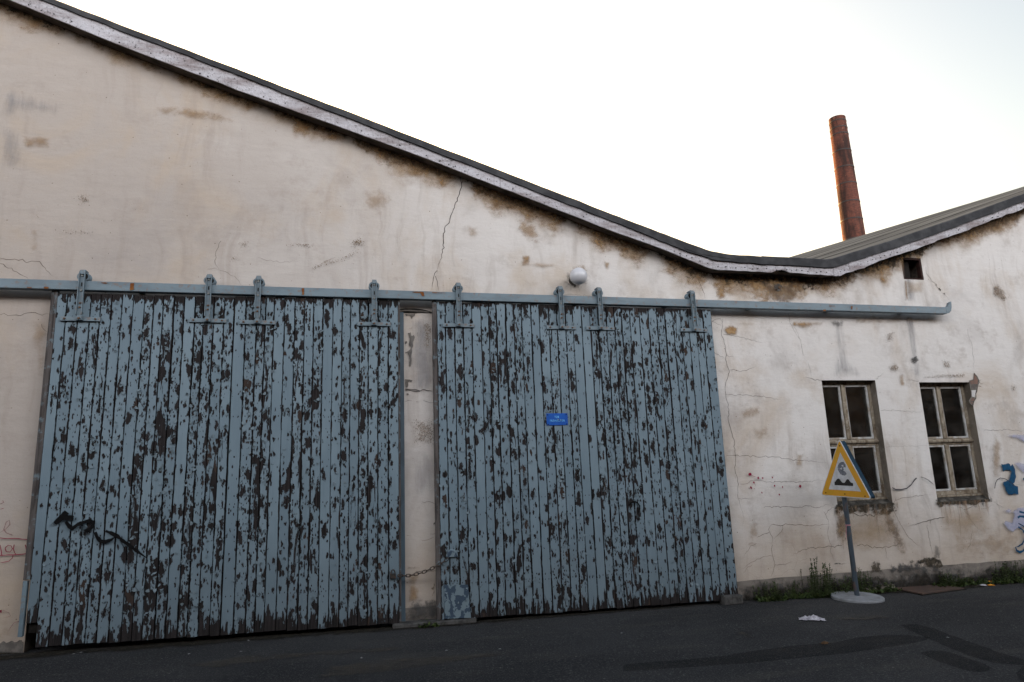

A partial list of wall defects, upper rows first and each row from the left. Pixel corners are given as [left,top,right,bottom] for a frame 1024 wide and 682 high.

crack [432,179,463,291]
damp [467,180,1024,302]
peeling [101,301,228,558]
crack [711,319,1001,569]
spalling [969,373,983,406]
peeling [103,561,163,625]
damp [835,503,943,573]